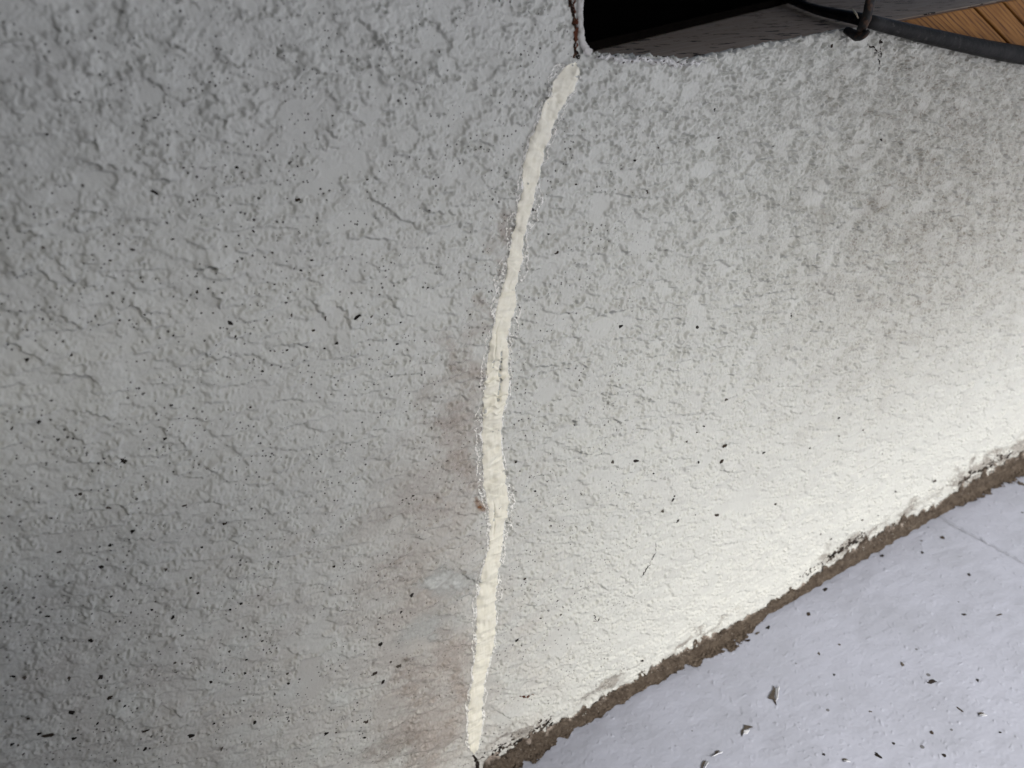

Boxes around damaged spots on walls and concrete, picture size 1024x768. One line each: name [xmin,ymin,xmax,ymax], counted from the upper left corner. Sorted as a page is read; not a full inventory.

crack [465,0,581,768]